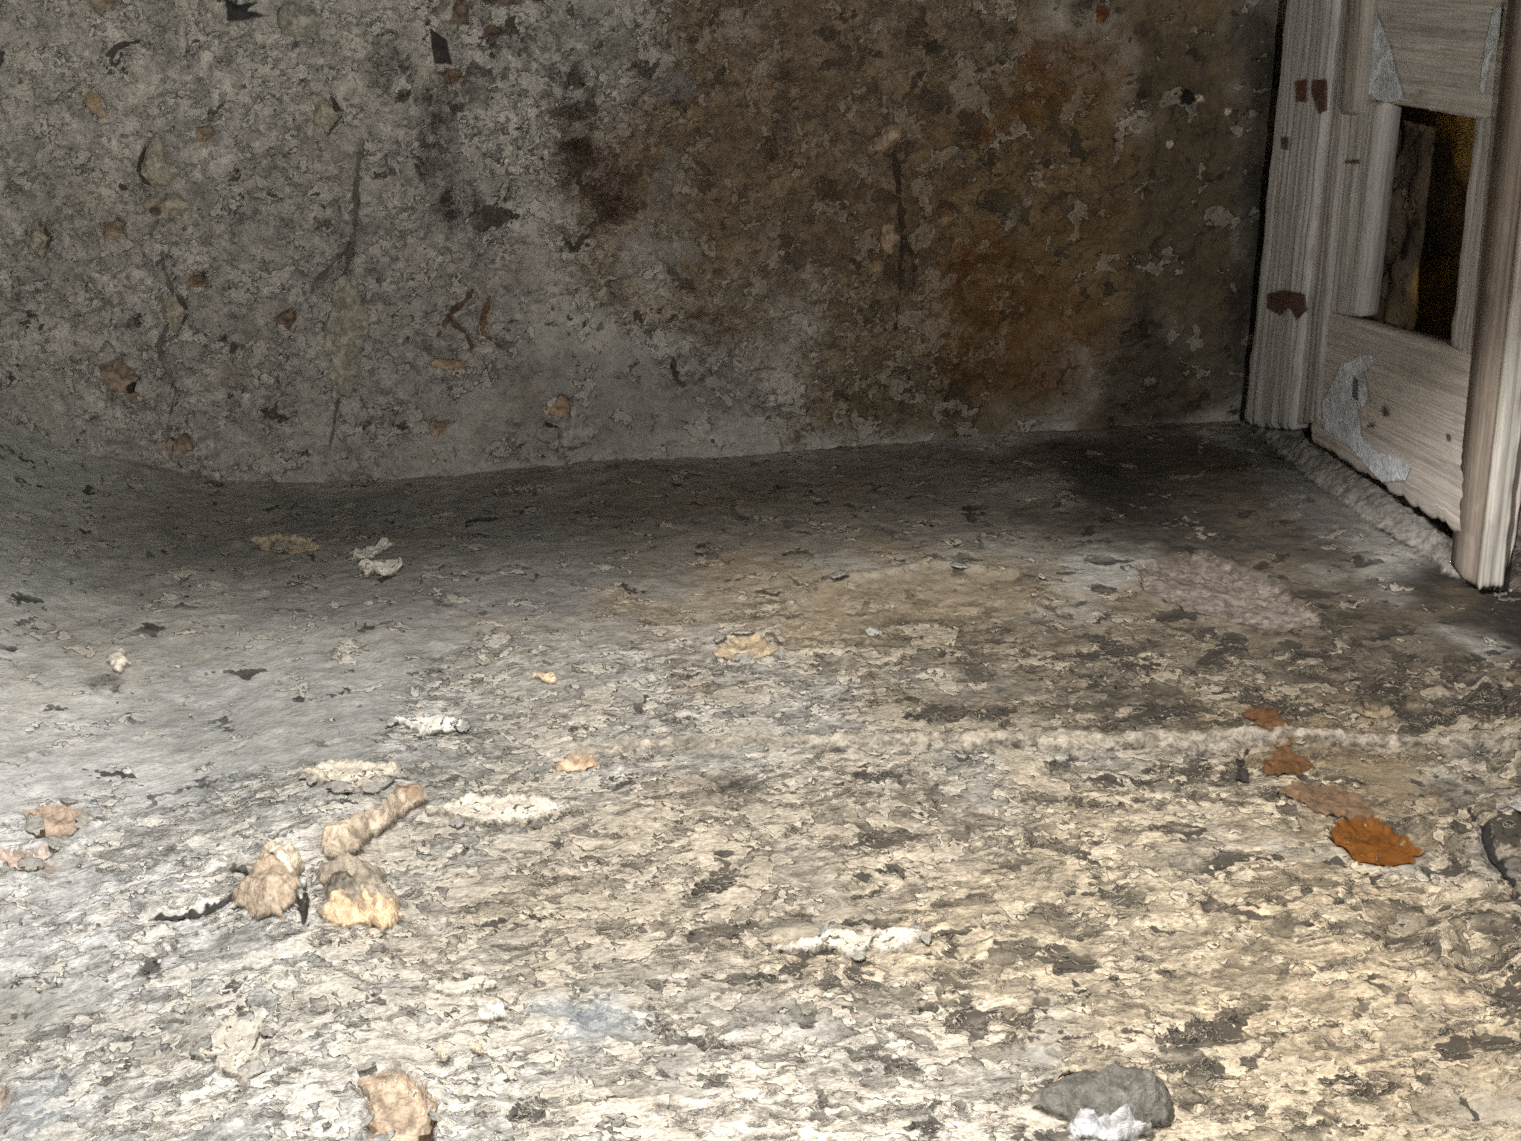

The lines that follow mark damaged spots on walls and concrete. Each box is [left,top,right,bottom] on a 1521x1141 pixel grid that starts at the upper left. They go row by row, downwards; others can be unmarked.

corrosion [1096,6,1109,23]